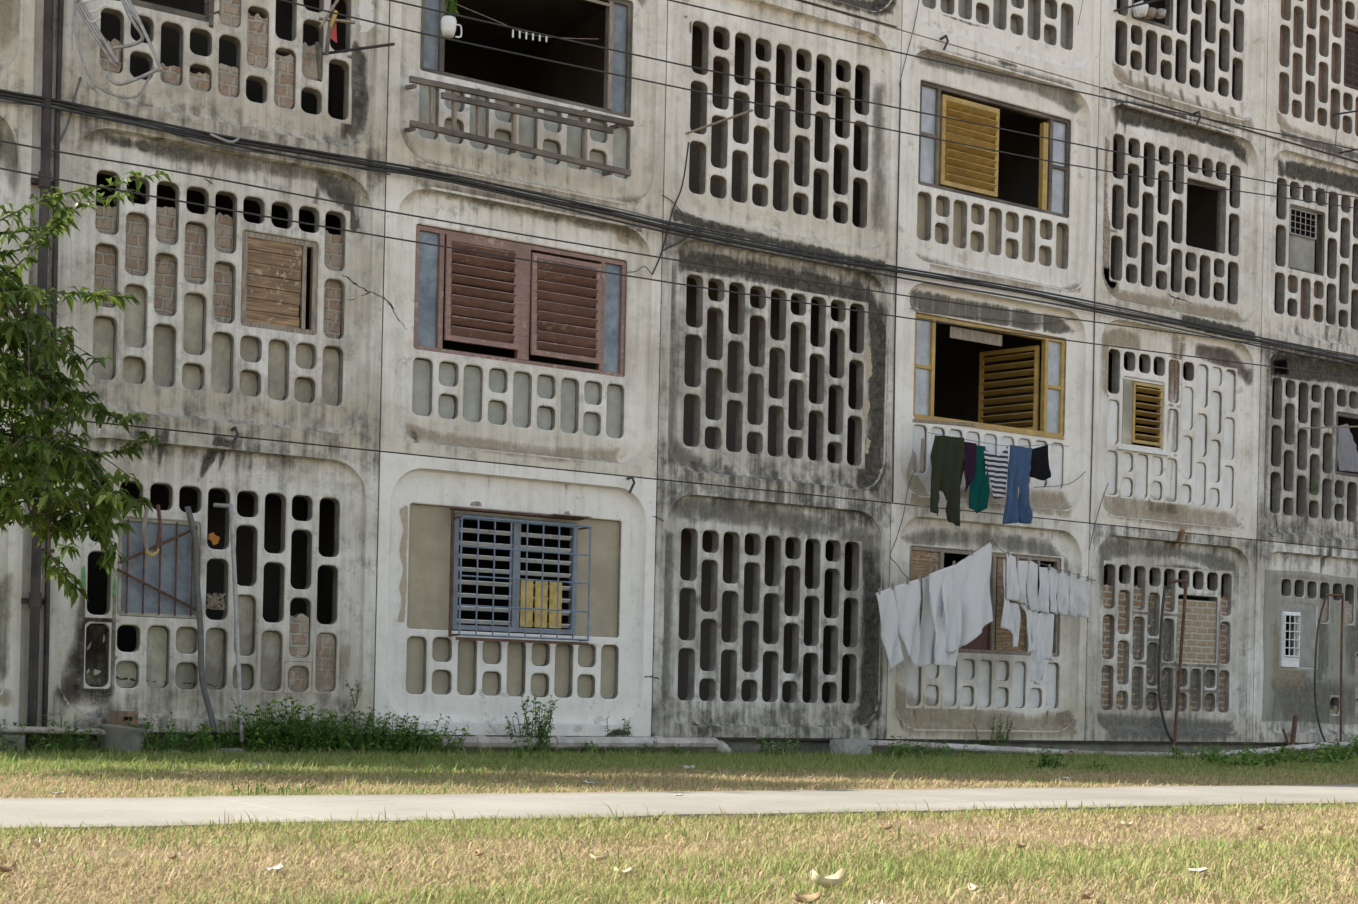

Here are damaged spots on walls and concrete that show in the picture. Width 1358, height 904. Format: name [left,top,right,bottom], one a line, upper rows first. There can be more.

leakage [662,532,673,705]
leakage [678,499,1074,738]